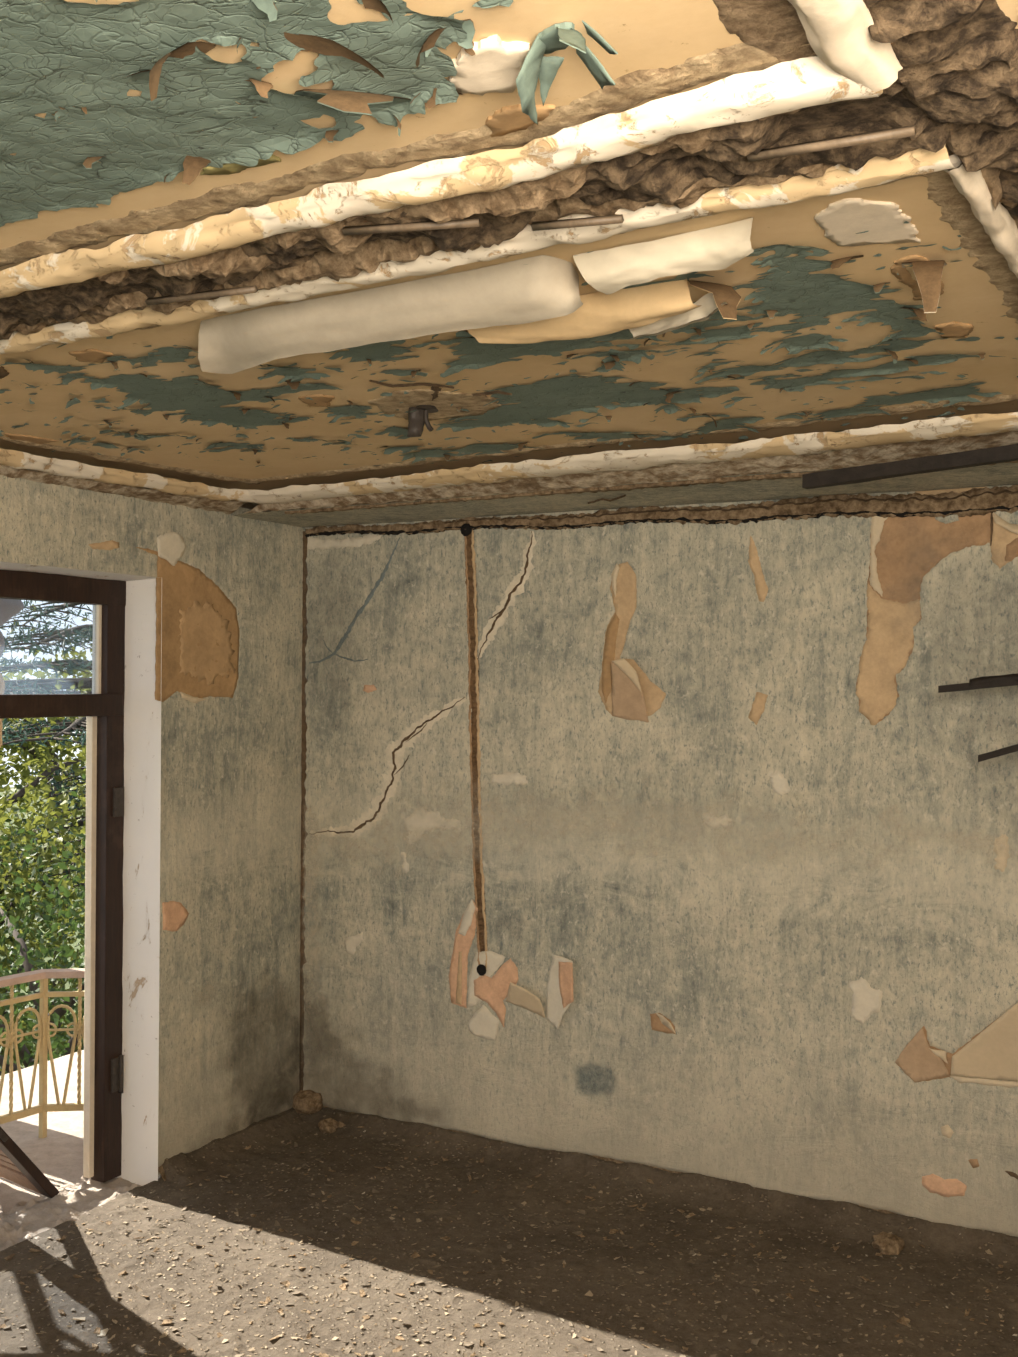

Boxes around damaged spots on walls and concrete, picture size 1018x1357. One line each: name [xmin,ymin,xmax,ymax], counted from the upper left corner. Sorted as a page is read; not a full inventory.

flaking render [0,0,1018,467]
peeling [136,532,240,703]
crack [299,531,467,1091]
crack [477,531,537,658]
flaking render [284,470,1018,1040]
peeling [895,1003,1018,1088]